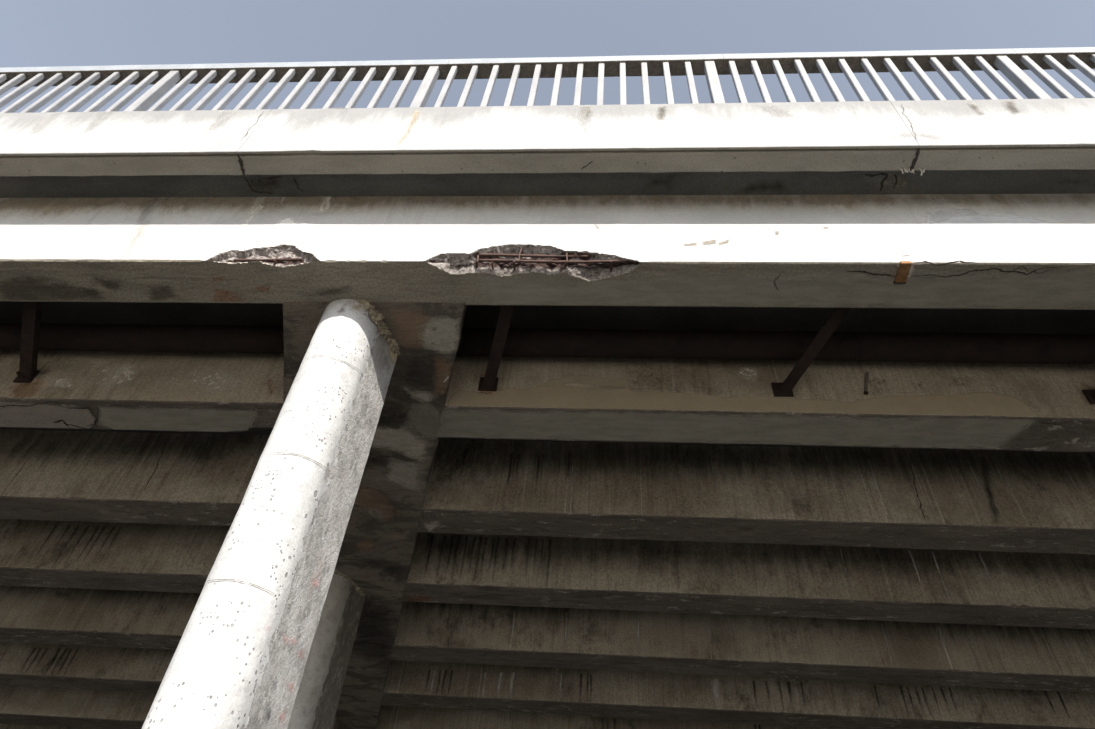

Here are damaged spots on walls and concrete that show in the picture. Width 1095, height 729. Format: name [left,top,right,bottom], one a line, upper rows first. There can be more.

crack [902,106,920,171]
spalling [206,244,320,267]
spalling [425,244,641,282]
crack [848,260,1059,278]
damp [429,447,1095,516]